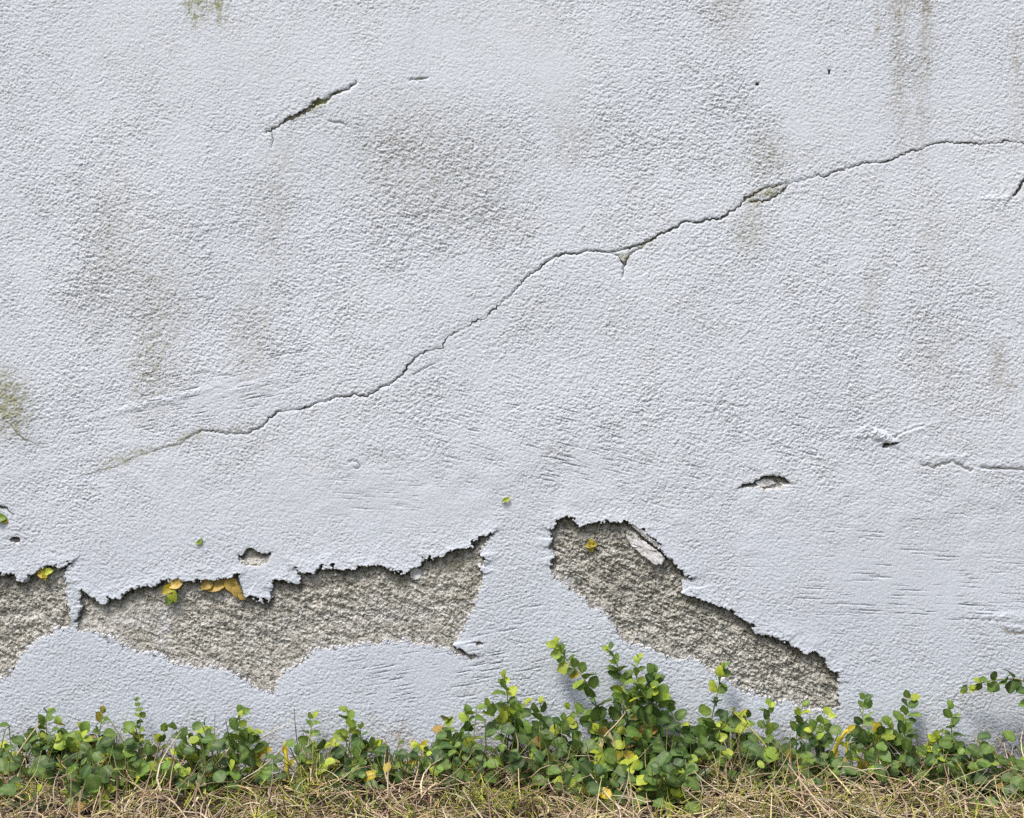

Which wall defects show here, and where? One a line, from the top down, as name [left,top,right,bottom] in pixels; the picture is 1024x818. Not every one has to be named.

crack [266,83,356,147]
crack [76,139,1024,477]
spalling [738,475,791,491]
spalling [0,533,494,694]
spalling [548,516,841,715]